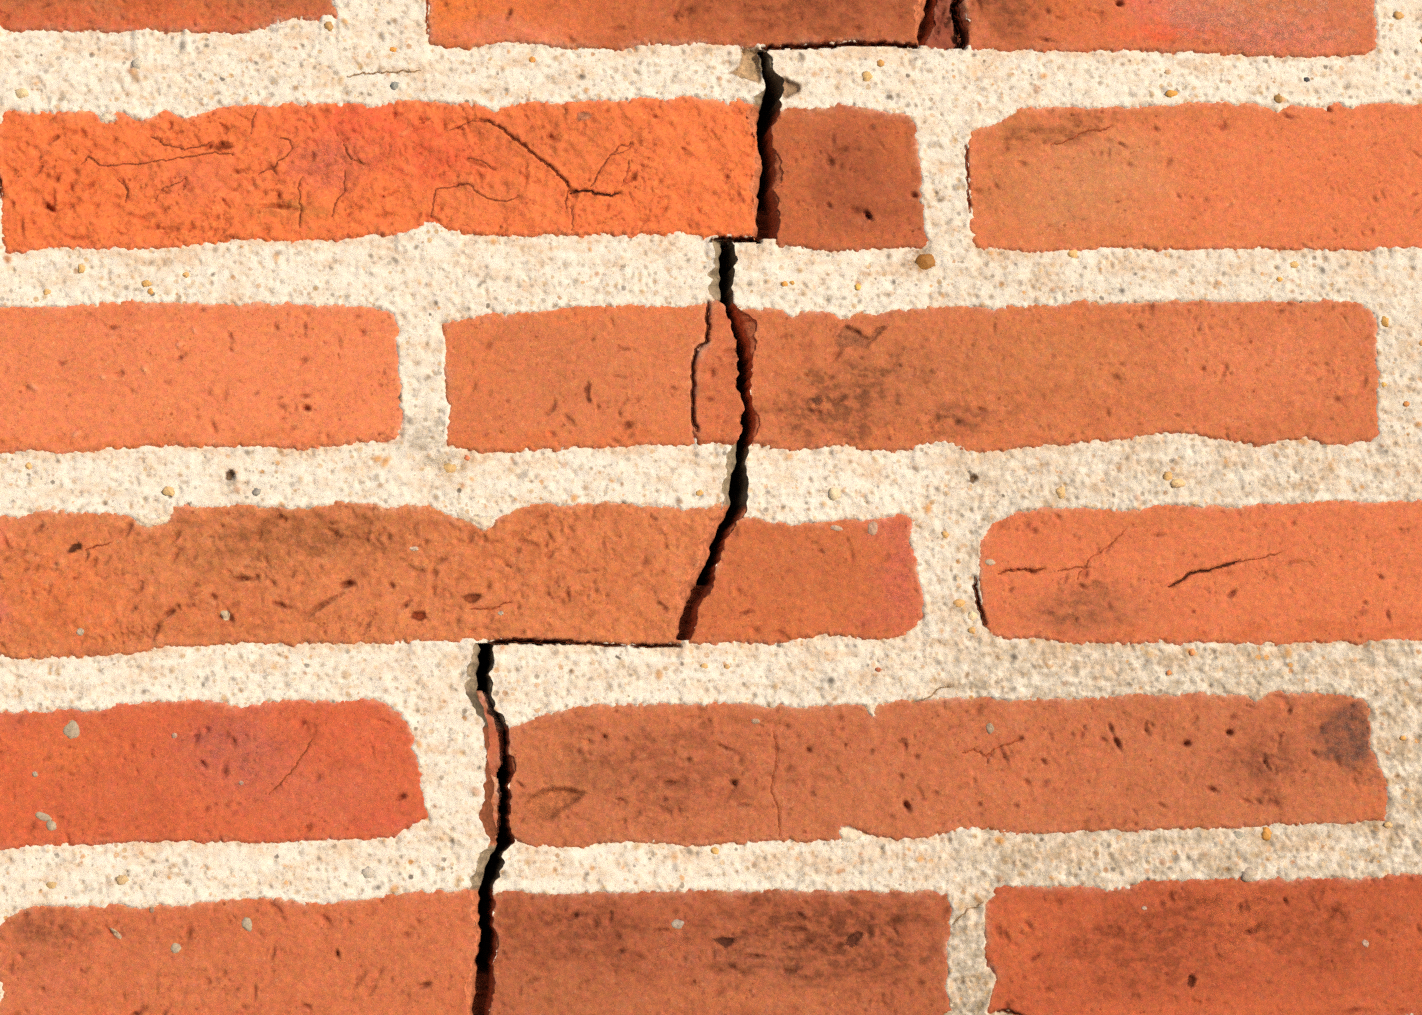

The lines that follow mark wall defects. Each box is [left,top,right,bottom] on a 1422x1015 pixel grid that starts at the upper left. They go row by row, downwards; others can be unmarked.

crack [347,69,421,77]
crack [431,119,634,231]
crack [464,0,968,1015]
crack [963,738,1024,764]
crack [953,901,984,925]